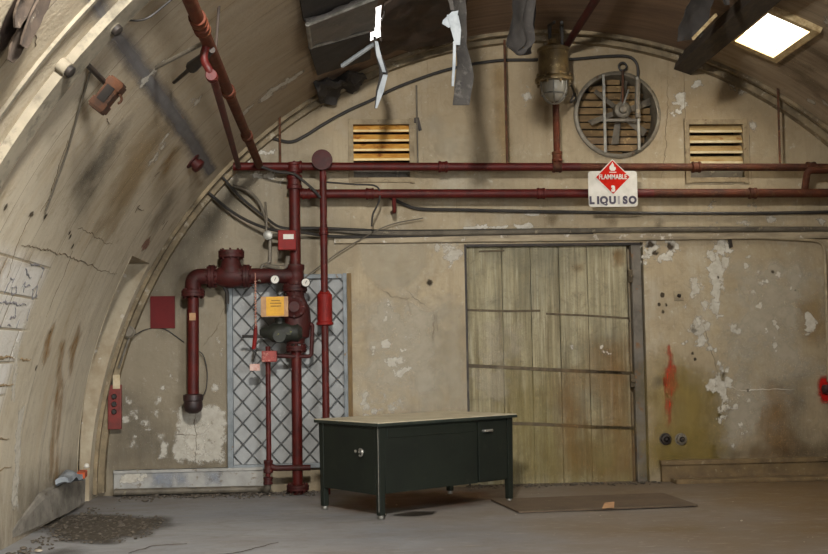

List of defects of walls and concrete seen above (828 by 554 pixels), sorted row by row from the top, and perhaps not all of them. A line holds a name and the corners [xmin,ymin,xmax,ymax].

crack [7,141,113,317]
peeling [682,240,751,424]
peeling [804,311,818,336]